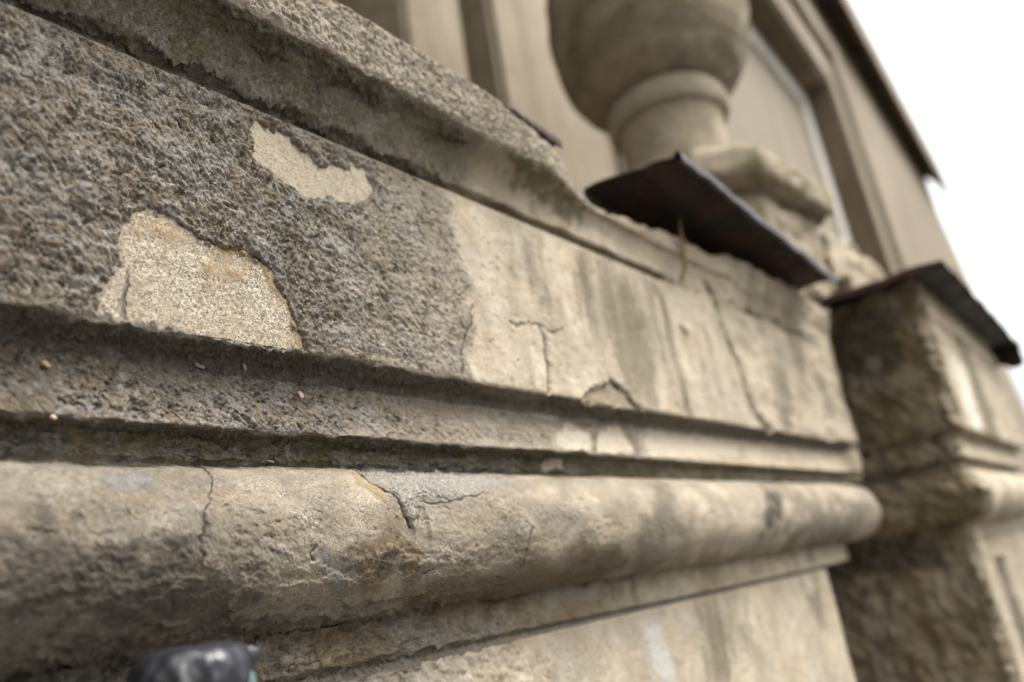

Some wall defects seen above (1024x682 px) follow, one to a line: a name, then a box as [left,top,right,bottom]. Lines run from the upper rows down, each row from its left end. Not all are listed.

spalling [250,121,373,204]
spalling [90,207,304,351]
crack [509,321,558,394]
crack [670,279,813,436]
crack [194,464,214,566]
crack [420,494,480,504]